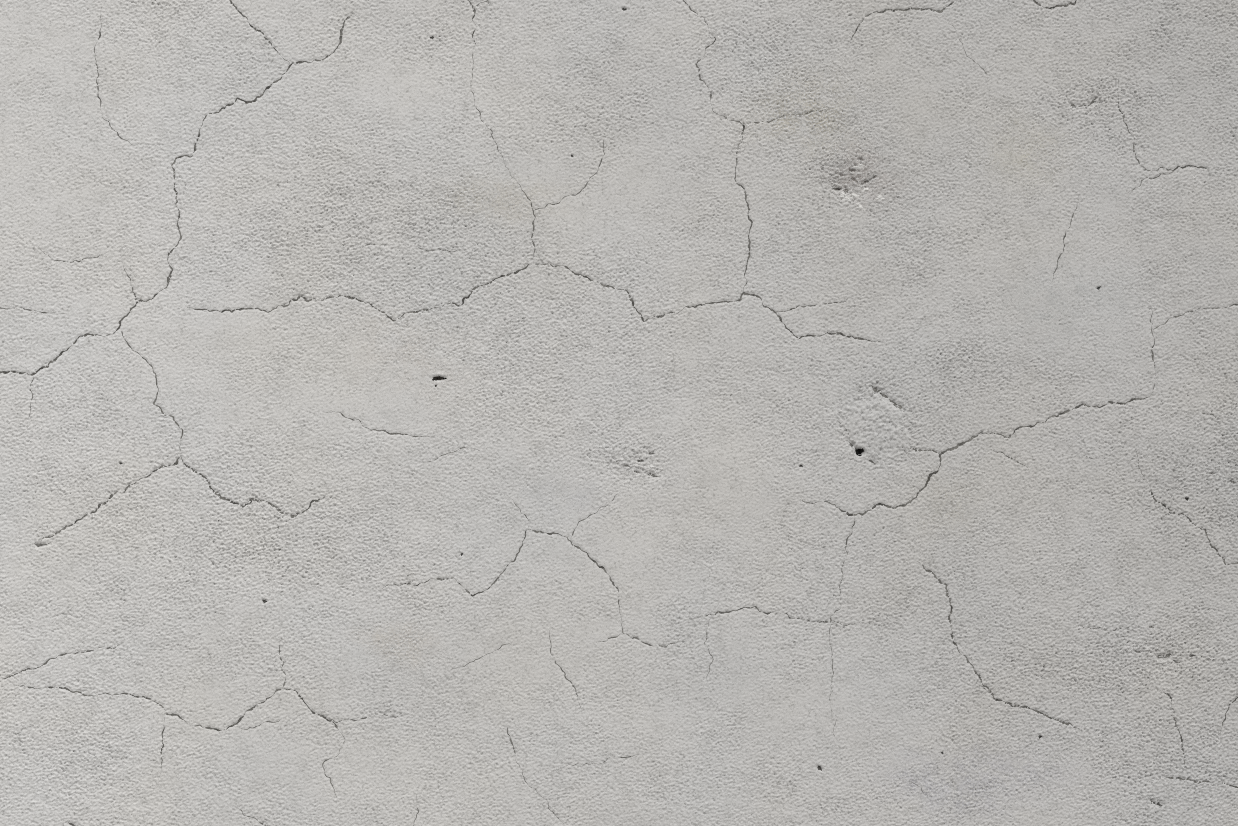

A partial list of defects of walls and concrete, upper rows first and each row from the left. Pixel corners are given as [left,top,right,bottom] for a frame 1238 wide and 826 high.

crack [851,2,986,73]
crack [1033,0,1077,9]
crack [1118,80,1222,191]
crack [0,0,881,541]
crack [1053,200,1079,276]
crack [383,304,1238,744]
crack [4,628,398,797]
crack [1150,693,1238,802]